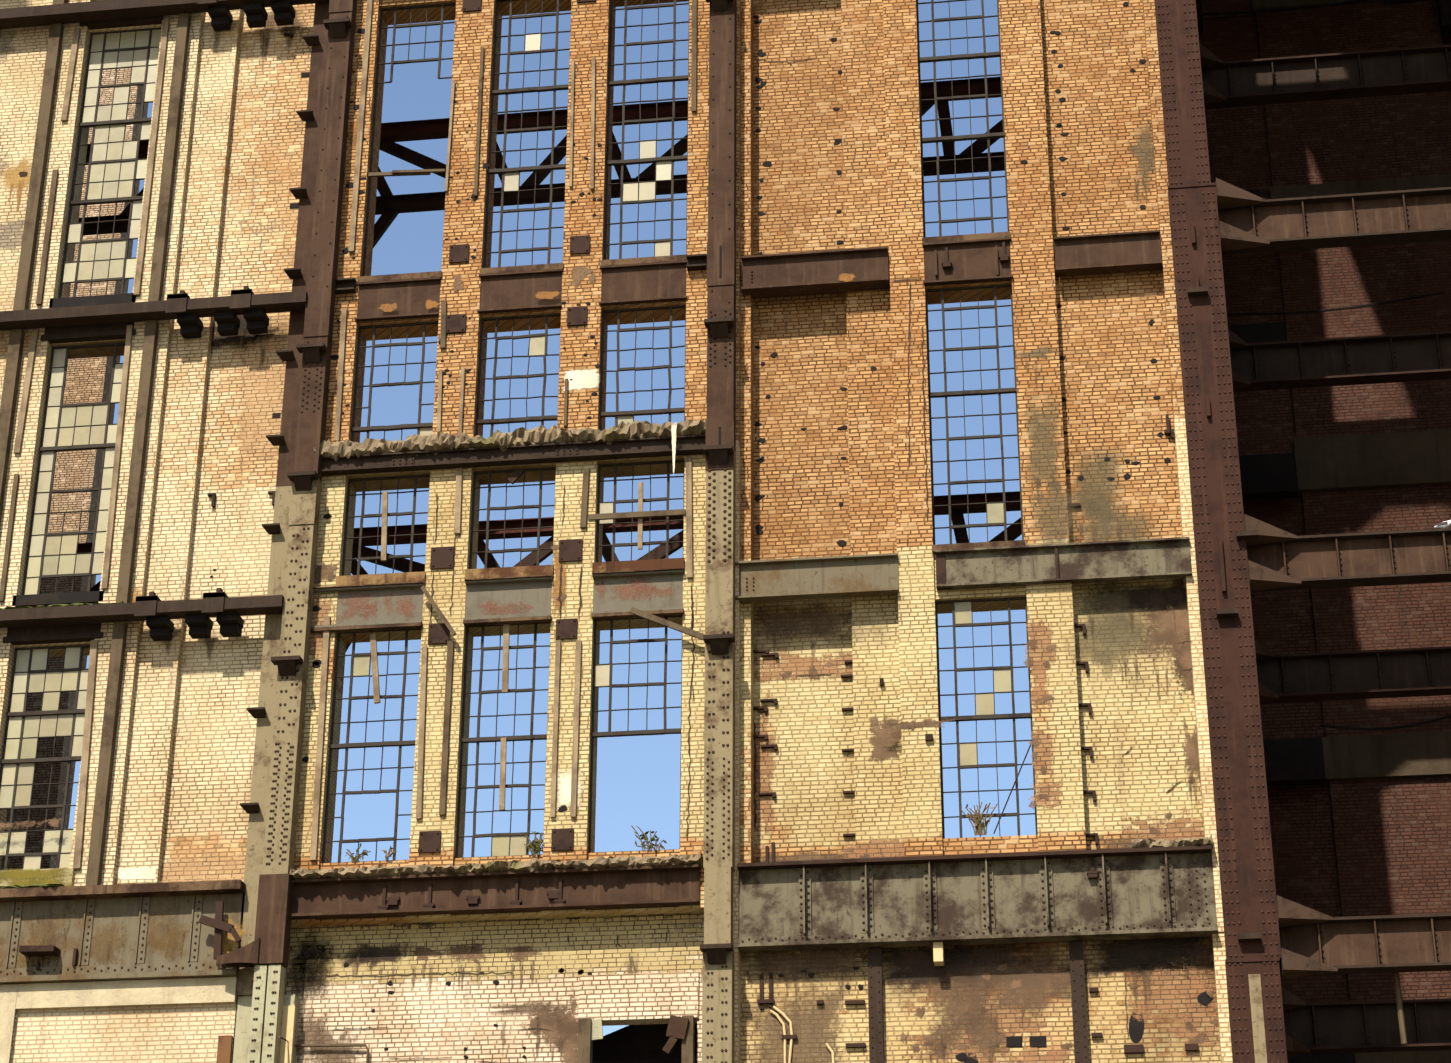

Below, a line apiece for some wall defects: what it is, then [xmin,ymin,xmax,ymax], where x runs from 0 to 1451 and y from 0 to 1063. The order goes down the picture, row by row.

leakage [1028,410,1144,544]
spalling [754,651,853,851]
spalling [0,818,62,836]
corrosion [222,920,243,955]
leakage [414,941,542,964]
leakage [296,1018,358,1063]
leakage [493,990,579,1063]
leakage [747,949,863,1063]
leakage [928,964,1091,1055]